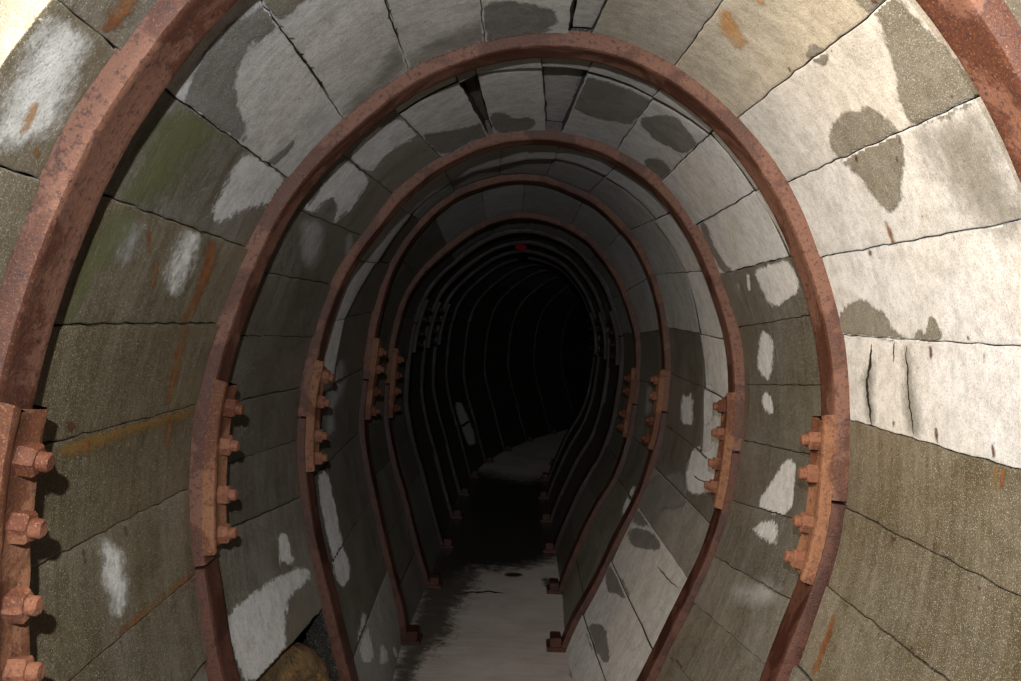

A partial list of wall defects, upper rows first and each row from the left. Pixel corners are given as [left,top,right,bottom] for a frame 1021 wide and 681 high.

crack [568,0,576,31]
corrosion [720,11,746,47]
leakage [574,72,696,153]
leakage [856,0,1010,221]
leakage [645,158,671,178]
leakage [829,106,904,212]
leakage [839,299,941,341]
corrosion [62,242,216,456]
crack [866,342,914,435]
corrosion [992,445,1005,489]
corrosion [814,616,834,672]